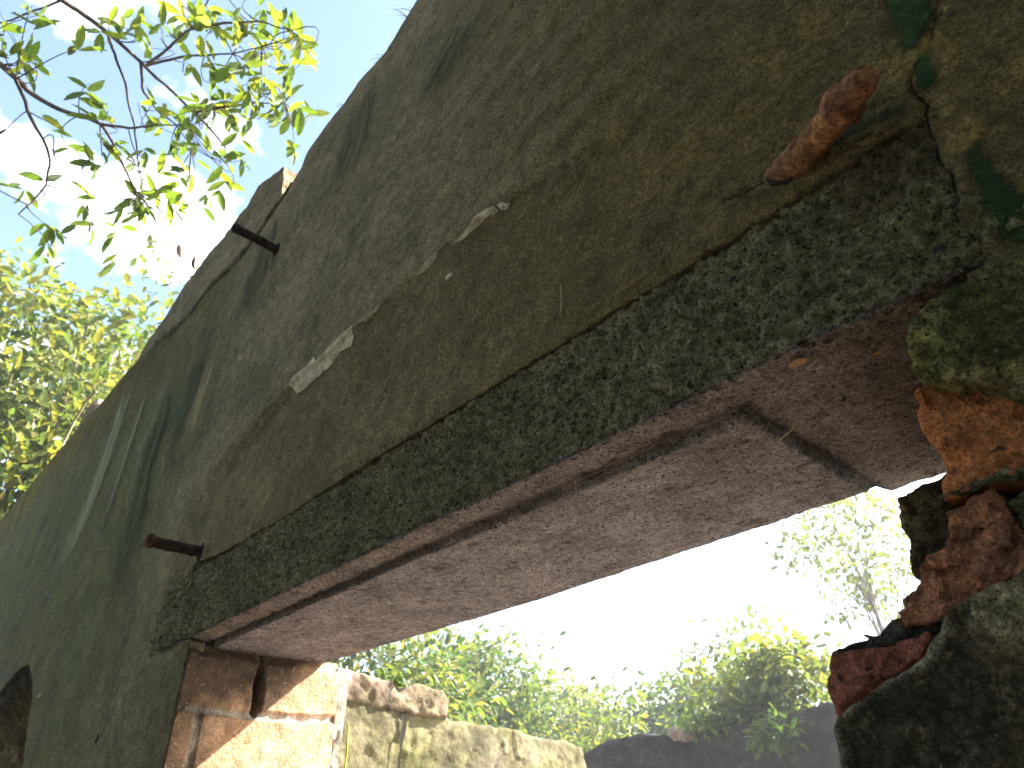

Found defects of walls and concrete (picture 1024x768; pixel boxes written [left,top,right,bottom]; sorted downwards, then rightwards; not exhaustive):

crack [910,8,978,249]
flaking render [452,202,510,245]
flaking render [289,303,380,394]
spalling [862,584,920,639]
spalling [0,668,41,768]